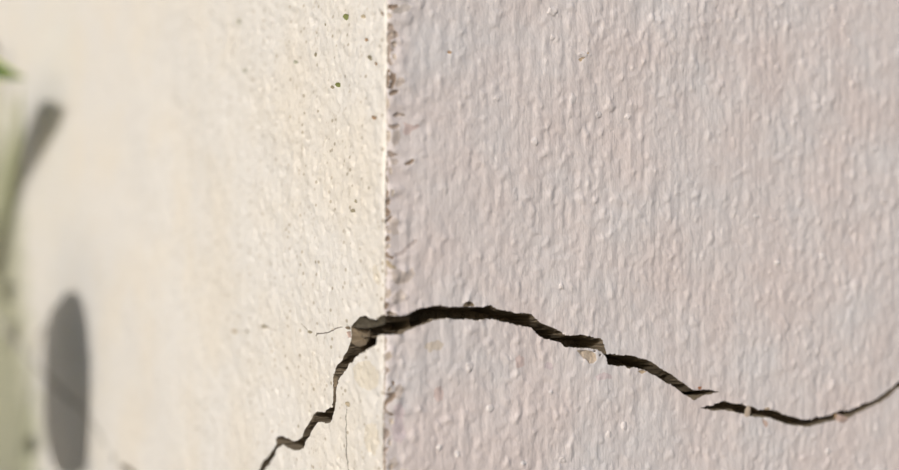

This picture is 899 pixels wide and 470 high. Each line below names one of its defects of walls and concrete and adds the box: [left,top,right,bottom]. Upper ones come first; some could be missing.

crack [118,462,132,470]
crack [260,305,899,470]